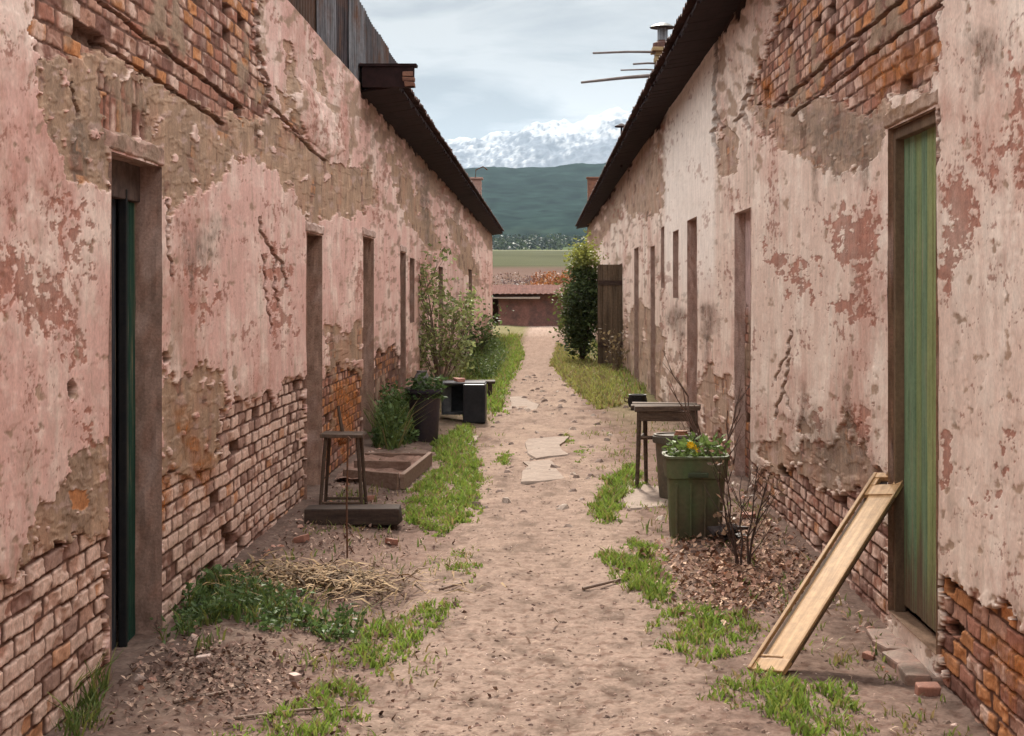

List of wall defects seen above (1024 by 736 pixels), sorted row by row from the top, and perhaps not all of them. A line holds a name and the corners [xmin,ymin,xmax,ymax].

flaking render [746,0,945,177]
spalling [0,0,379,385]
crack [258,216,287,334]
peeling [763,195,884,328]
peeling [938,49,1024,297]
flaking render [318,320,400,480]
crack [774,329,794,420]
flaking render [0,406,109,736]
flaking render [155,359,307,631]
spalling [753,404,888,558]
flaking render [846,513,889,627]
flaking render [939,575,1024,736]